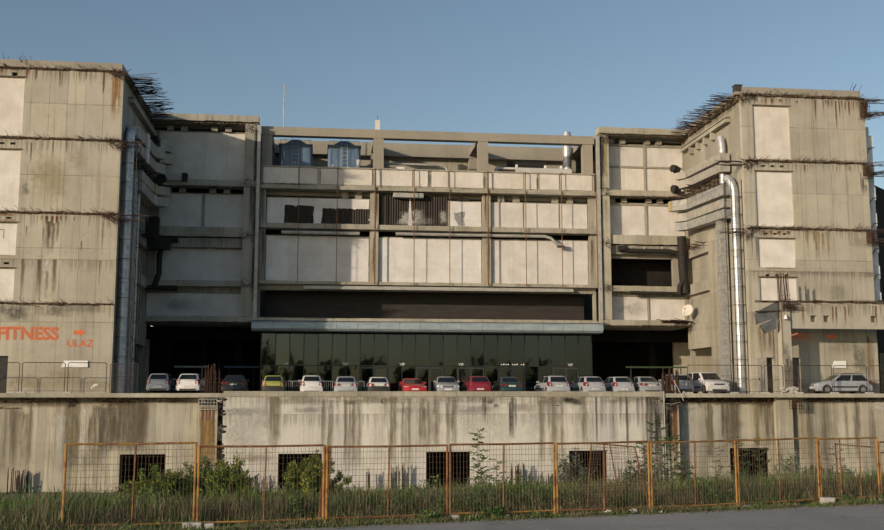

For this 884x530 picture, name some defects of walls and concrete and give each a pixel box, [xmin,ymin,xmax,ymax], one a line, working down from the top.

corrosion [103,72,121,110]
leakage [10,409,31,454]
leakage [57,402,145,459]
leakage [344,402,360,444]
leakage [390,397,456,453]
leakage [539,401,562,445]
leakage [707,402,737,453]